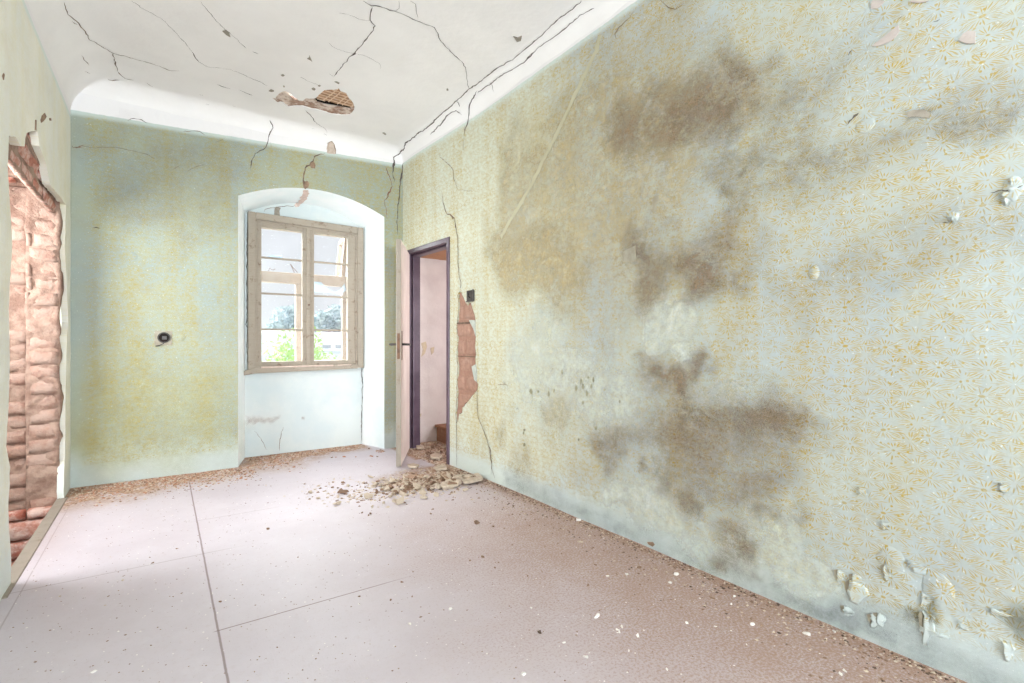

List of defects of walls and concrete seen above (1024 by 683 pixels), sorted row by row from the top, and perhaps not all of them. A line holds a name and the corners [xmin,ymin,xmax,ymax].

crack [64,2,170,85]
spalling [269,74,354,114]
crack [303,111,326,187]
crack [329,2,594,288]
water stain [494,71,754,294]
flaking render [6,113,64,567]
spalling [455,291,478,423]
water stain [645,232,731,394]
crack [456,410,495,478]
water stain [604,484,684,535]
peeling [834,569,886,628]
peeling [918,592,950,646]